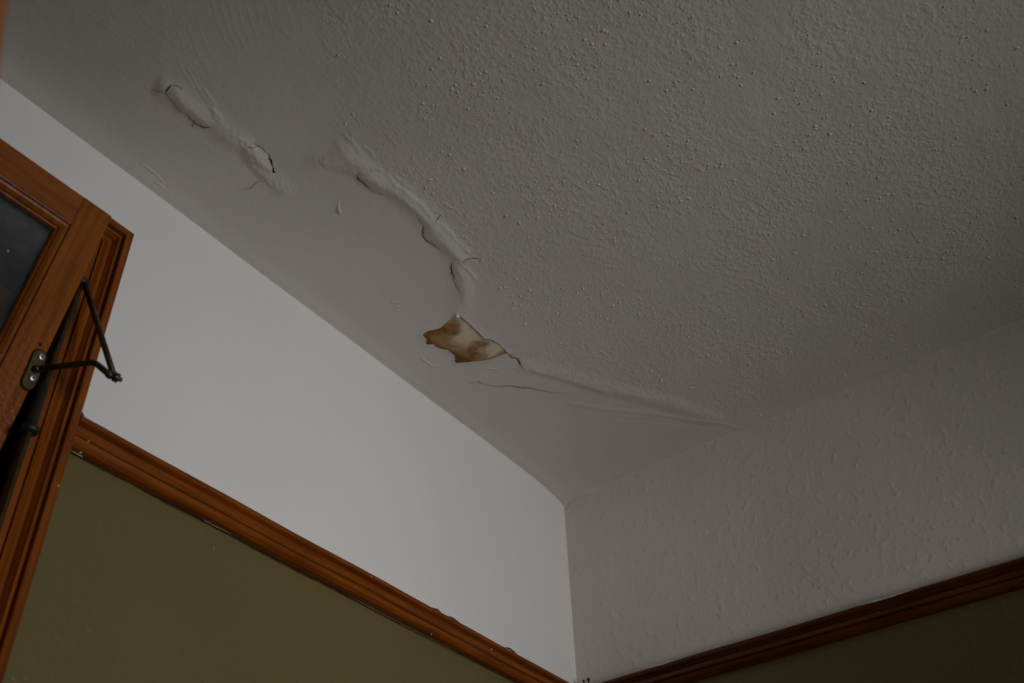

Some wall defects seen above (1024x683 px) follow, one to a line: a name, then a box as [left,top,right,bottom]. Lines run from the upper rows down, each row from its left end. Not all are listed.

crack [153,85,210,128]
crack [239,143,276,191]
crack [419,214,478,293]
damp [424,323,488,363]